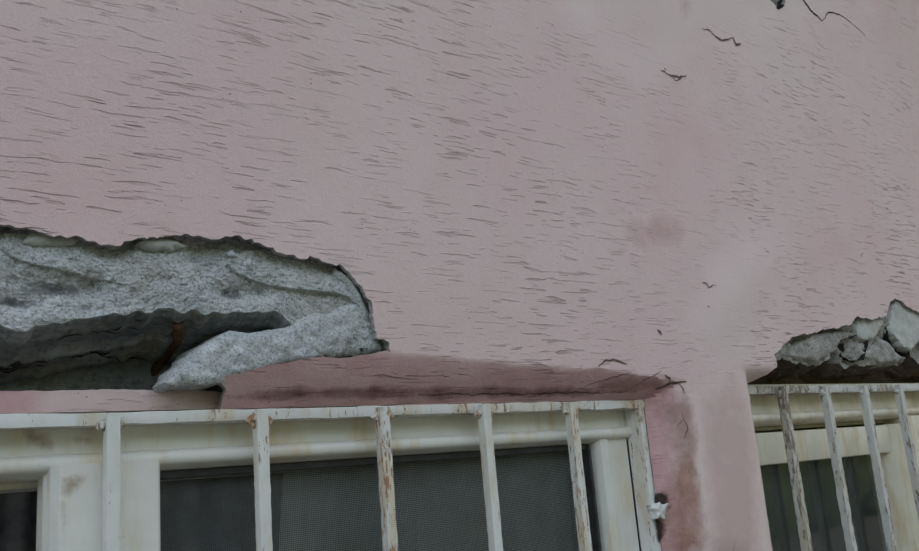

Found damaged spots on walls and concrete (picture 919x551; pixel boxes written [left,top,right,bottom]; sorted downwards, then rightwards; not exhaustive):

crack [702,28,741,46]
crack [776,0,865,35]
spalling [0,226,387,393]
crack [0,320,157,373]
spalling [747,300,919,385]